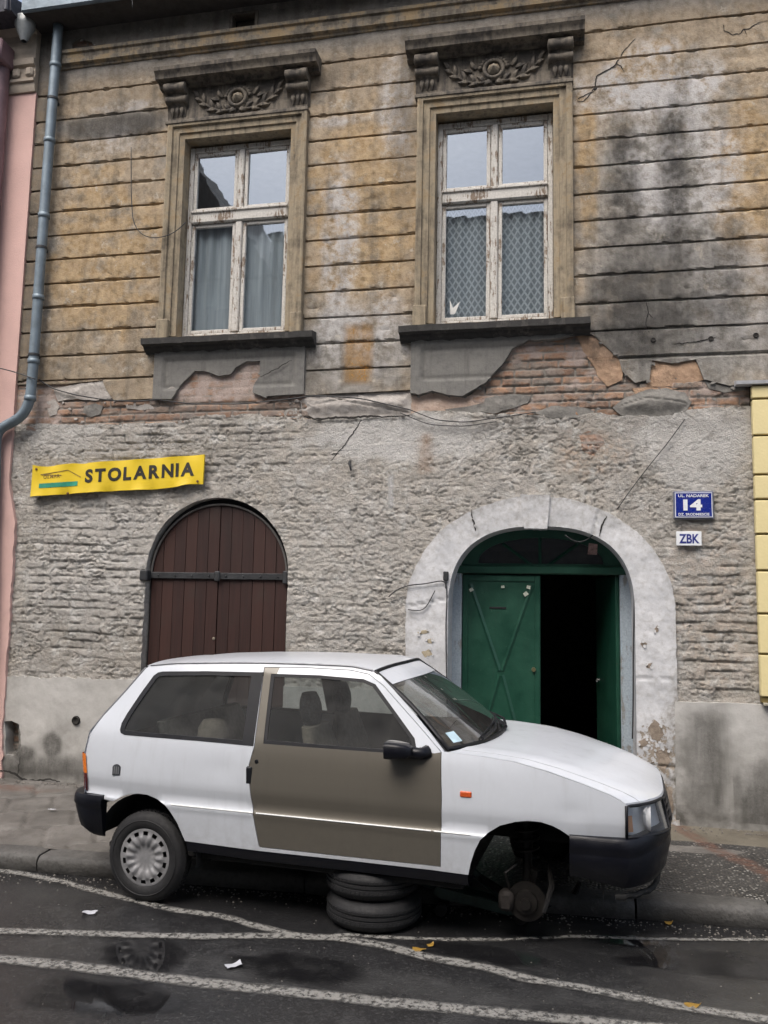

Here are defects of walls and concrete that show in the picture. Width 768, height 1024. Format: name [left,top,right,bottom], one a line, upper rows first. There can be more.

crack [578,39,635,102]
flaking render [16,362,309,431]
flaking render [411,332,750,419]
peeling [638,720,674,813]